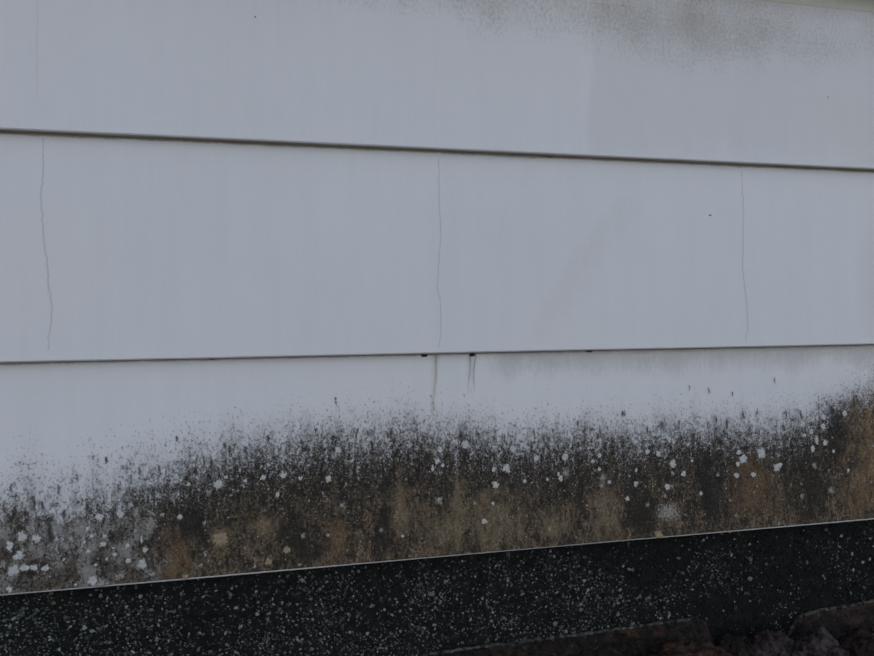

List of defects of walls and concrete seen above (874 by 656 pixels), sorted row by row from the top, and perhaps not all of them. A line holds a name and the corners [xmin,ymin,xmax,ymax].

crack [40,137,58,350]
crack [435,159,443,348]
leakage [0,385,874,594]